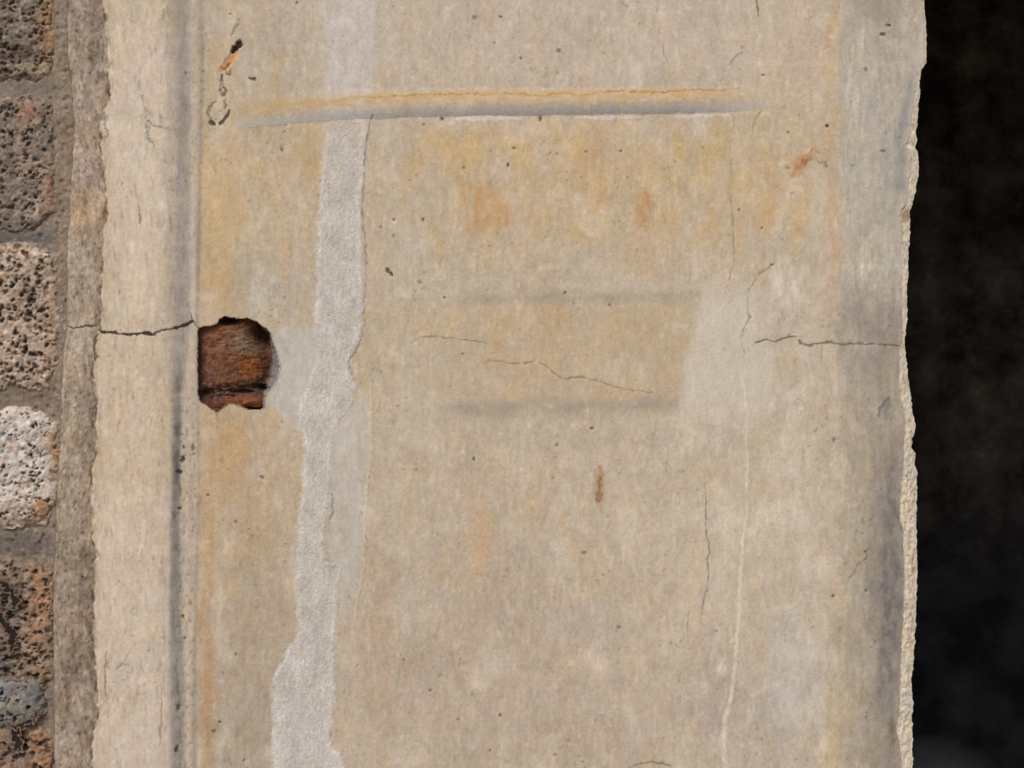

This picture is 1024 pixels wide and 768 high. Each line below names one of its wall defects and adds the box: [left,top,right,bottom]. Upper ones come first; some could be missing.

corrosion [204,23,241,94]
corrosion [729,146,828,238]
crack [725,111,900,359]
crack [67,310,199,362]
crack [413,334,658,393]
corrosion [592,459,607,512]